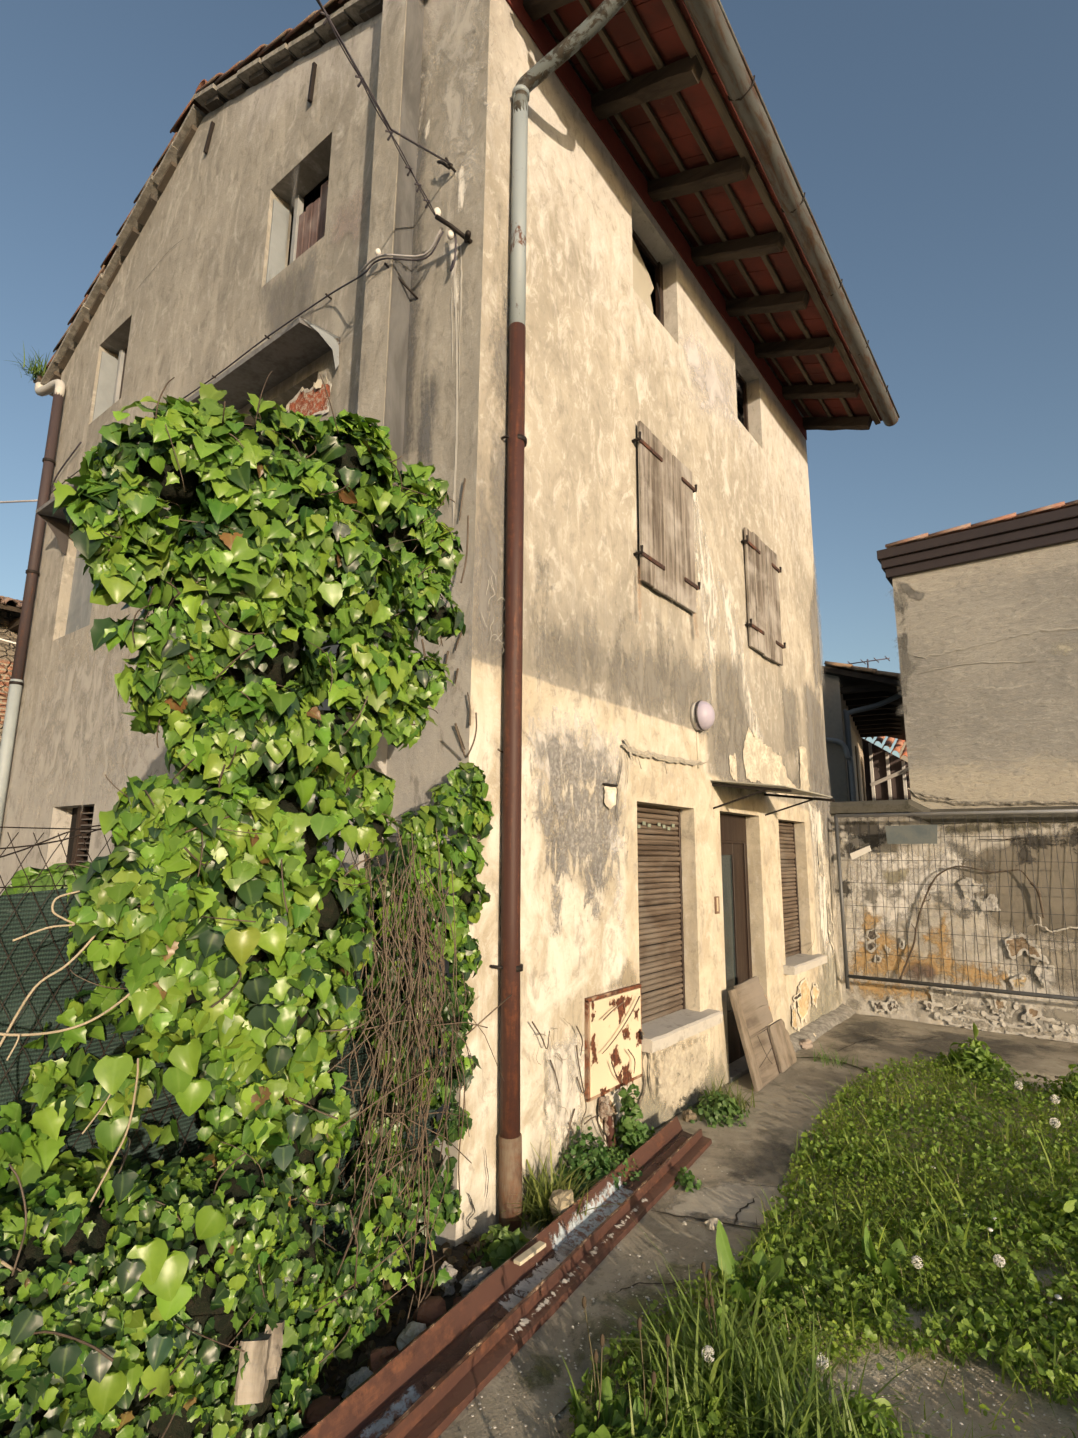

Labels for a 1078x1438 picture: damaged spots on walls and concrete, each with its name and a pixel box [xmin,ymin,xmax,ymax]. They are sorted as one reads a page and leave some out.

spalling [286,372,332,416]
leakage [528,717,628,934]
flaking render [958,877,1001,914]
spalling [866,930,905,962]
flaking render [792,977,819,1032]
flaking render [871,996,903,1014]
flaking render [923,933,1078,1039]